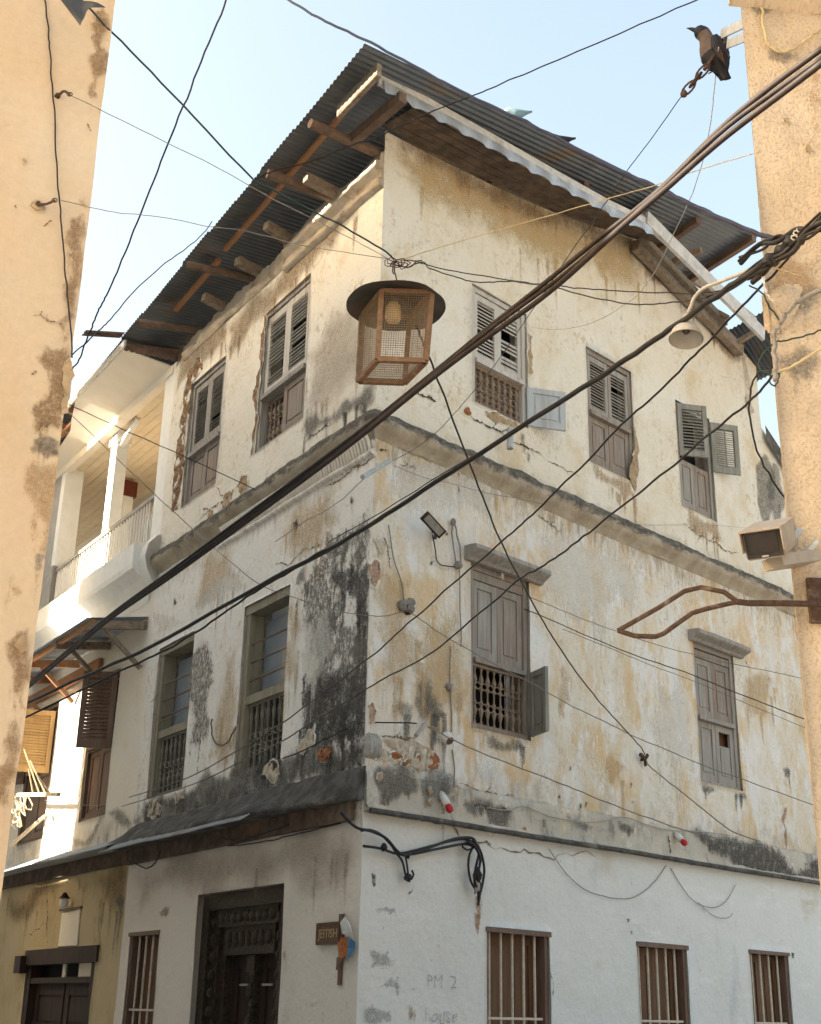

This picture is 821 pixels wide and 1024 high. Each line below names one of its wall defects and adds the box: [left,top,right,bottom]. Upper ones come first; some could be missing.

water stain [89,8,109,94]
water stain [27,218,85,568]
flaking render [171,348,203,511]
flaking render [249,314,268,458]
water stain [757,456,785,521]
water stain [145,512,370,821]
flaking render [374,739,441,806]
crack [421,821,595,860]
water stain [696,828,819,879]